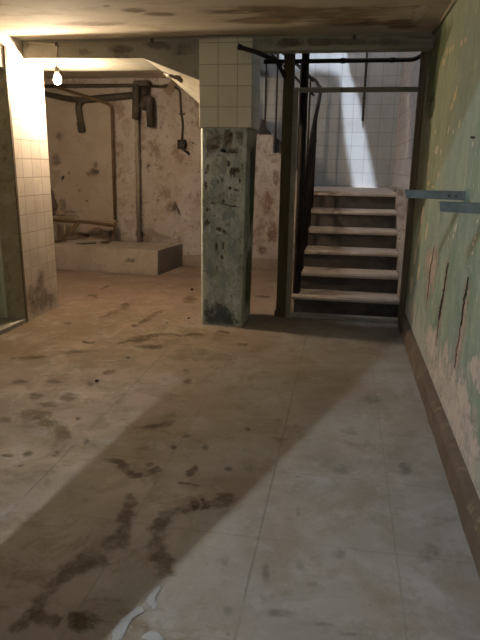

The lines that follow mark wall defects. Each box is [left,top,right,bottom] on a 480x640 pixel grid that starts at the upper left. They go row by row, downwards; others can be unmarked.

damp [118,333,202,349]
damp [205,300,233,333]
crack [423,246,449,345]
crack [454,277,470,372]
peeling [424,325,480,490]